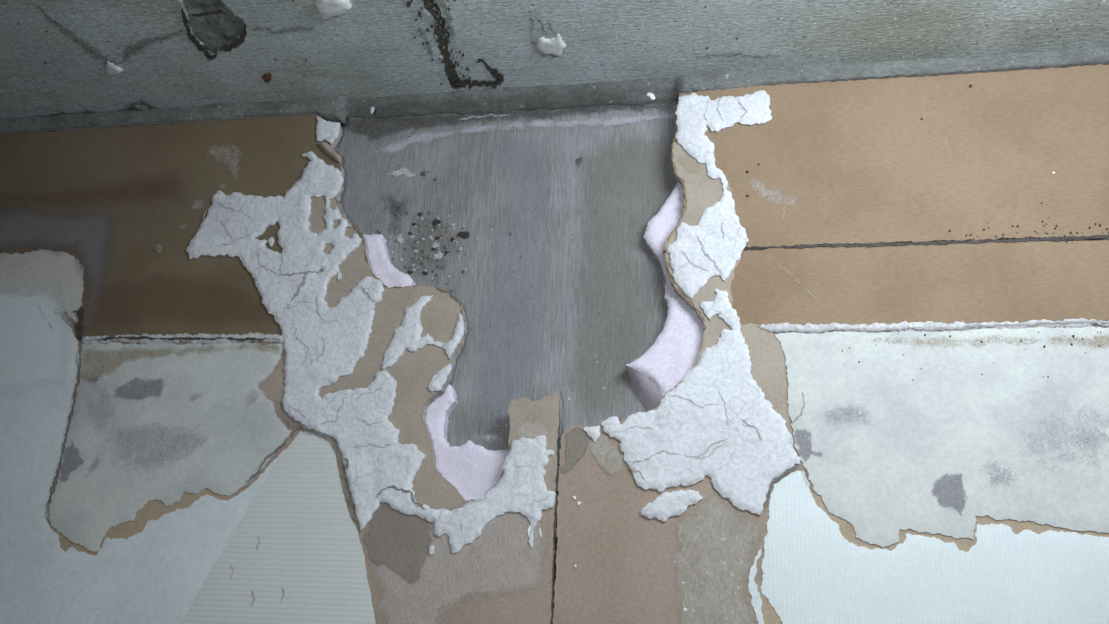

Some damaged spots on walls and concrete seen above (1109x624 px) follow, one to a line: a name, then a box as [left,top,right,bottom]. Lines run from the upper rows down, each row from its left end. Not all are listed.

crack [37,5,185,77]
crack [406,0,504,90]
flaking render [186,116,556,555]
flaking render [584,90,800,522]